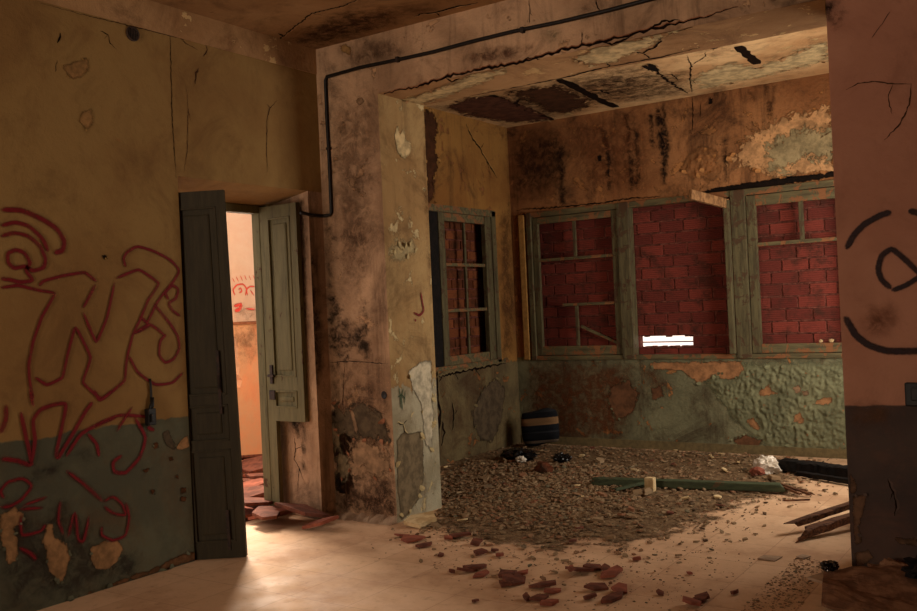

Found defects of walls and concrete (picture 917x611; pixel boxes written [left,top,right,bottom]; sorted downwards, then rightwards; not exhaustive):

crack [41,3,207,171]
crack [466,124,497,177]
spalling [402,67,596,203]
crack [384,6,738,130]
damp [545,70,678,104]
damp [650,108,669,182]
crack [734,46,761,69]
peeling [703,101,834,193]
crack [846,81,911,140]
peeling [331,360,437,520]
peeling [0,507,26,564]
peeling [42,524,72,584]